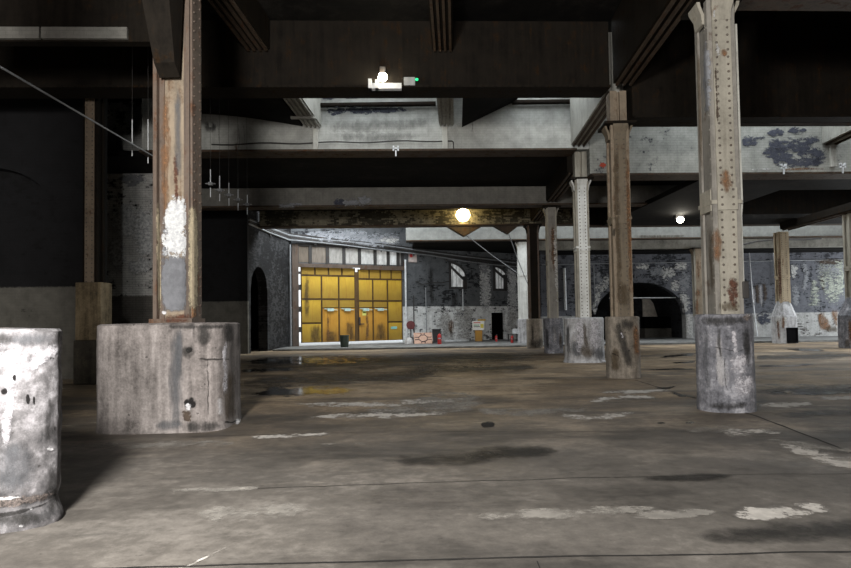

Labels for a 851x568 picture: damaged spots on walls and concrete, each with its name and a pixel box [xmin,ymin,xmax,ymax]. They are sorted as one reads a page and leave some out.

peeling [107,102,142,151]
peeling [742,127,826,169]
peeling [107,173,198,324]
rust [722,279,738,309]
peeling [791,259,845,307]